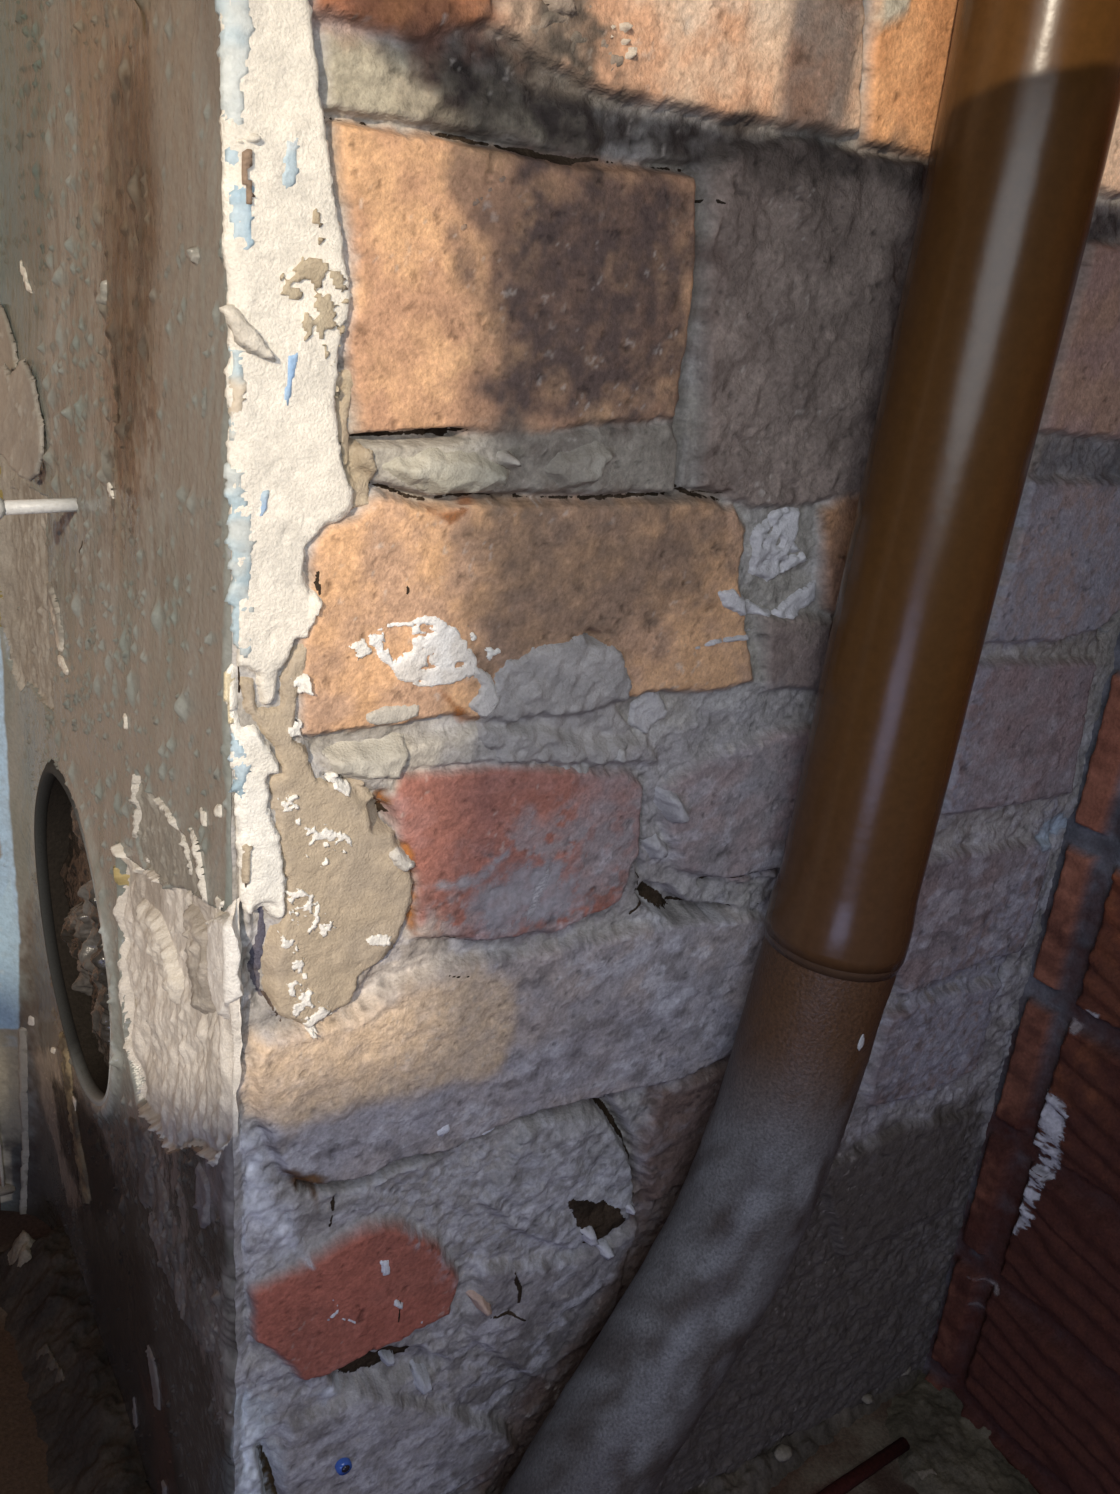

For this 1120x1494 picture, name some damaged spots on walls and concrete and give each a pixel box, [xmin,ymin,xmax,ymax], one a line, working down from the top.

spalling [0,303,68,711]
peeling [110,0,416,1353]